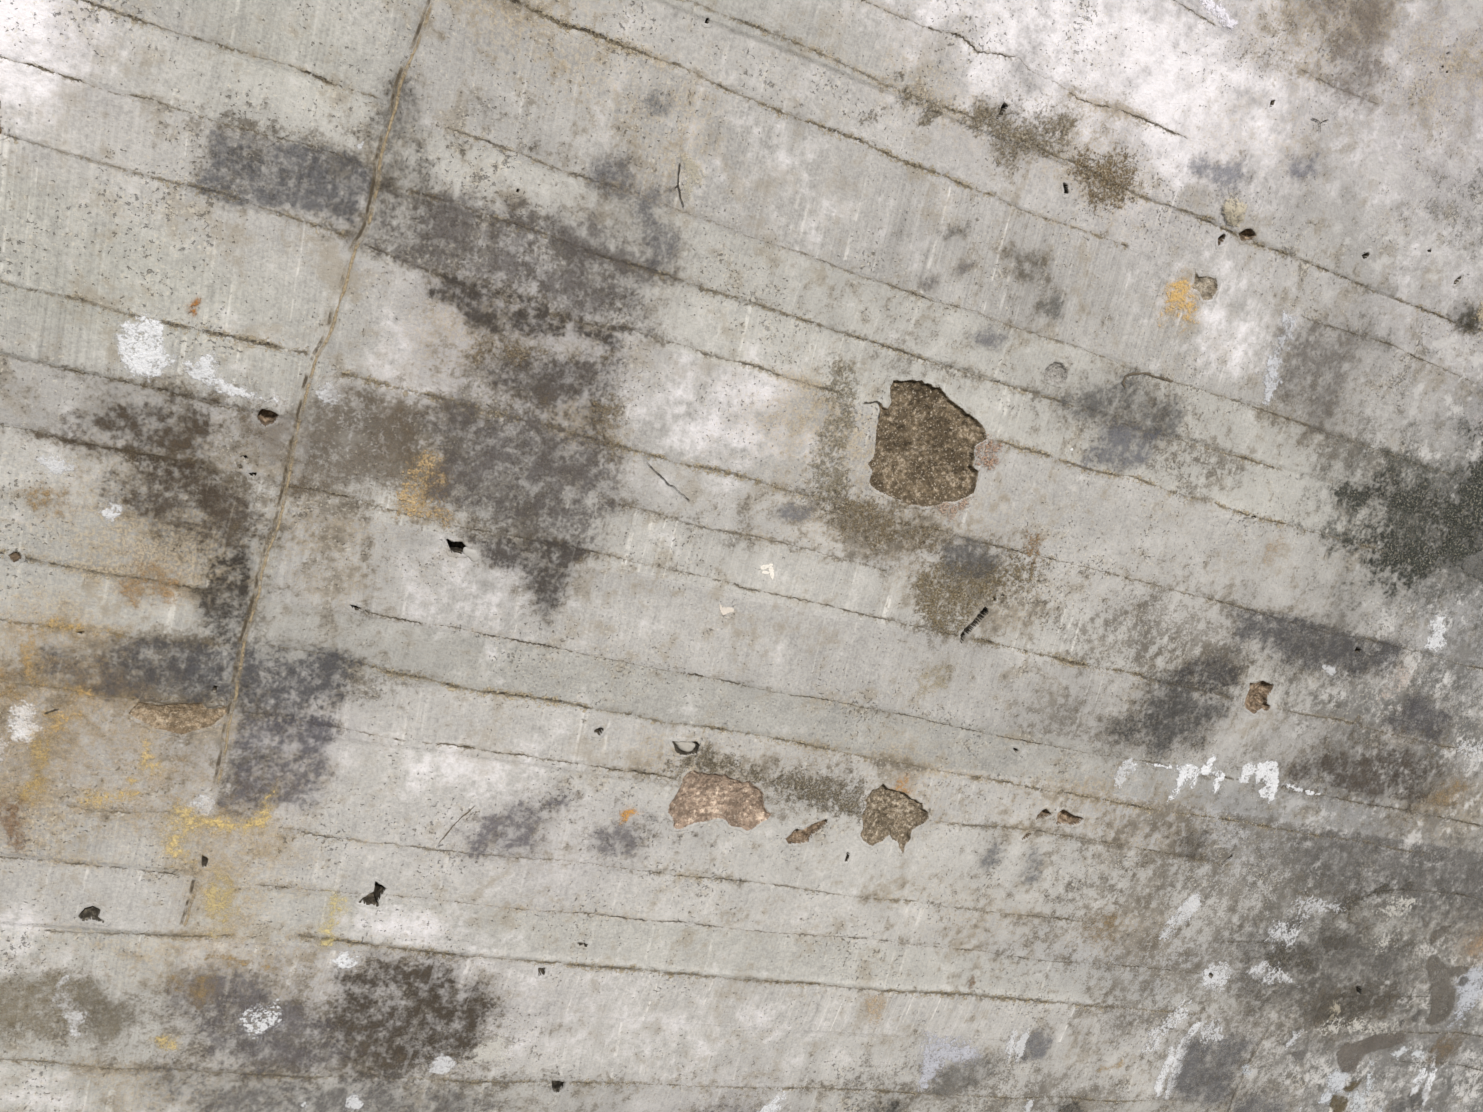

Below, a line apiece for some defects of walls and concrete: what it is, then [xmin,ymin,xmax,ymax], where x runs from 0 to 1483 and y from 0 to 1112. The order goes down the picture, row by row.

leakage [197,133,679,624]
spalling [864,376,991,510]
leakage [1421,615,1446,652]
spalling [122,696,232,738]
peeling [1242,678,1276,717]
spalling [655,738,932,856]
leakage [156,949,508,1112]